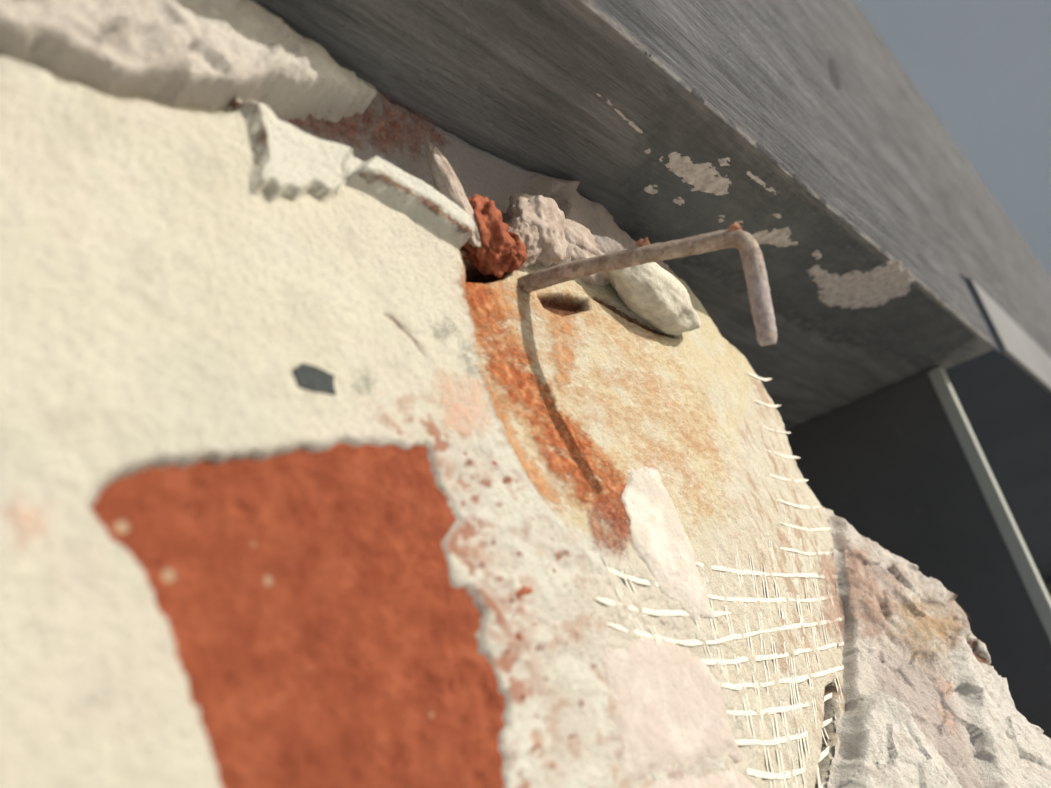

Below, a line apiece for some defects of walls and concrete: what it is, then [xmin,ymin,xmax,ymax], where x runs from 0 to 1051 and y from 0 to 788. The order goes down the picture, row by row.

peeling [644,148,732,206]
peeling [752,213,798,247]
peeling [807,249,915,309]
rust [462,280,631,554]
flaking render [89,443,505,788]
peeling [509,586,533,602]
peeling [620,466,714,621]
peeling [824,508,1051,788]